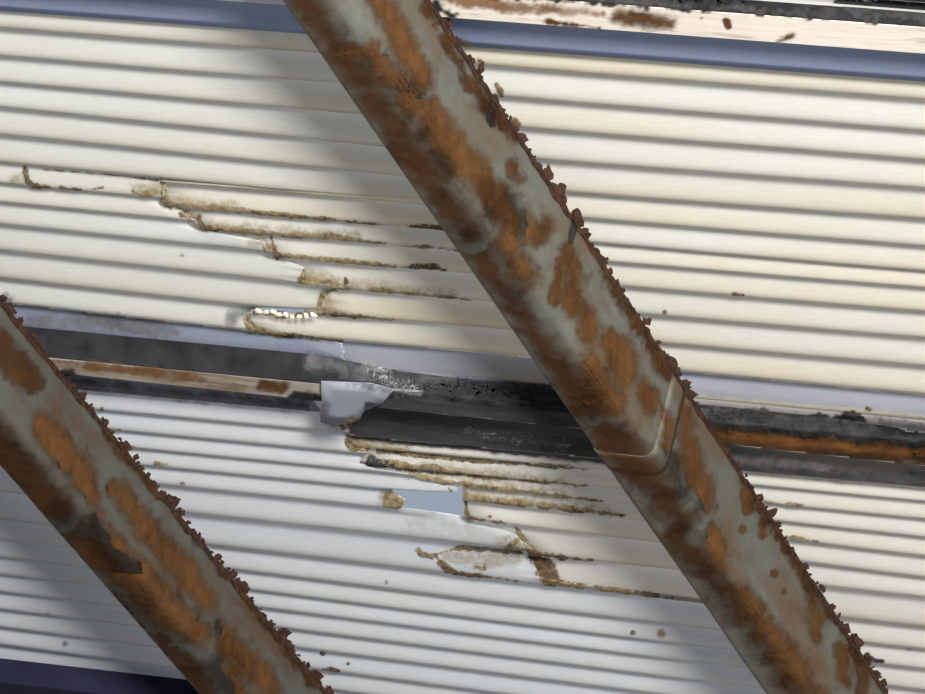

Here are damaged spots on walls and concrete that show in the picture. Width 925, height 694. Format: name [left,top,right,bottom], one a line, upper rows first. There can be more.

rust [0,295,334,694]
spalling [380,491,407,510]
rust [291,0,925,694]